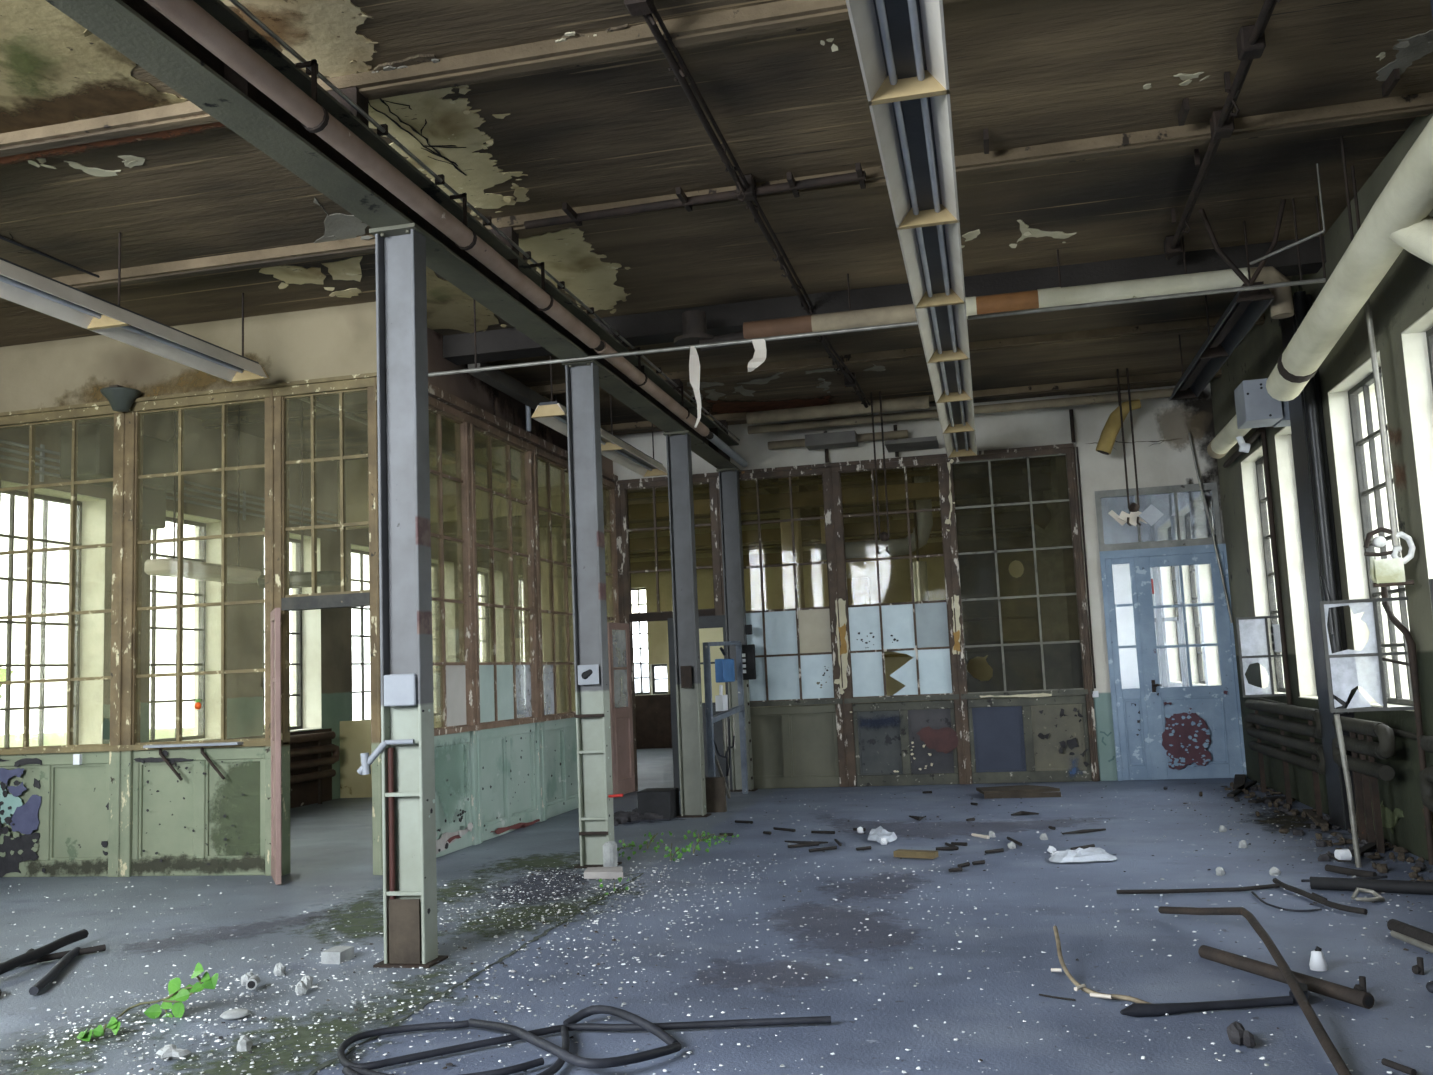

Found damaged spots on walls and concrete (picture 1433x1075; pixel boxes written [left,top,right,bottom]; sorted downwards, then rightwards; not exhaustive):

peeling [221,0,440,78]
damp [0,78,169,134]
peeling [28,139,145,177]
crack [368,99,466,176]
peeling [368,85,530,217]
peeling [259,256,363,298]
peeling [313,198,373,243]
peeling [519,228,631,314]
peeling [1009,220,1076,248]
peeling [834,598,849,694]
peeling [0,758,46,877]
peeling [426,779,540,854]